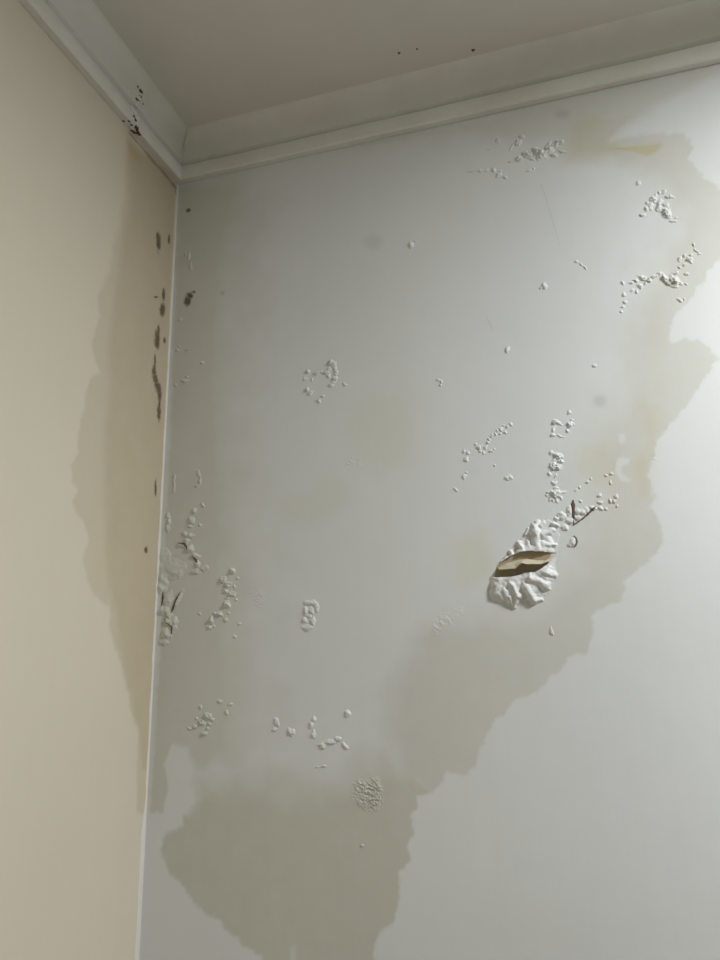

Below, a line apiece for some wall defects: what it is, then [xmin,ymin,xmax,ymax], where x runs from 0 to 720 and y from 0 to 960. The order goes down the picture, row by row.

damp [69,82,176,819]
peeling [157,531,209,647]
damp [148,63,720,960]